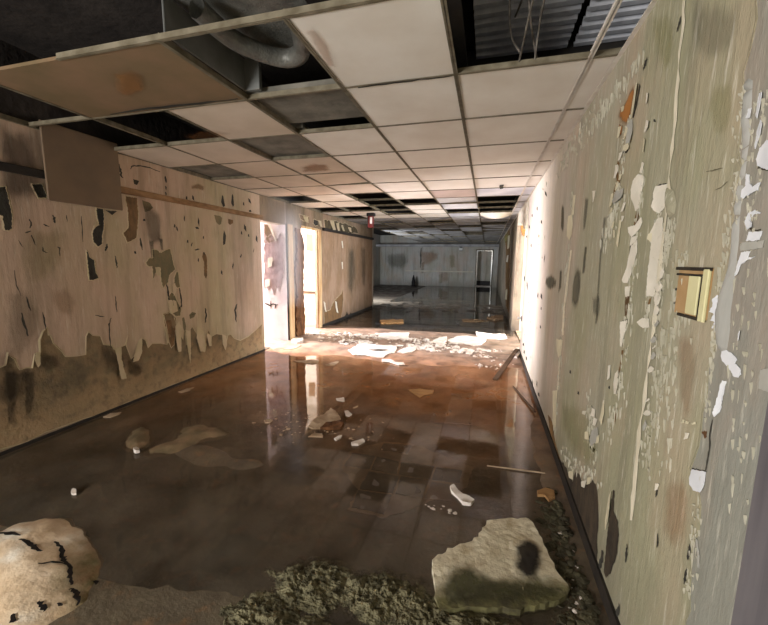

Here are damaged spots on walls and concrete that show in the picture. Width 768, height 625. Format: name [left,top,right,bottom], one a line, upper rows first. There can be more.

peeling [0,185,14,232]
peeling [30,182,47,199]
peeling [85,207,117,281]
peeling [0,248,263,450]
peeling [122,195,153,254]
peeling [214,194,251,245]
peeling [241,214,358,337]
peeling [548,0,768,625]